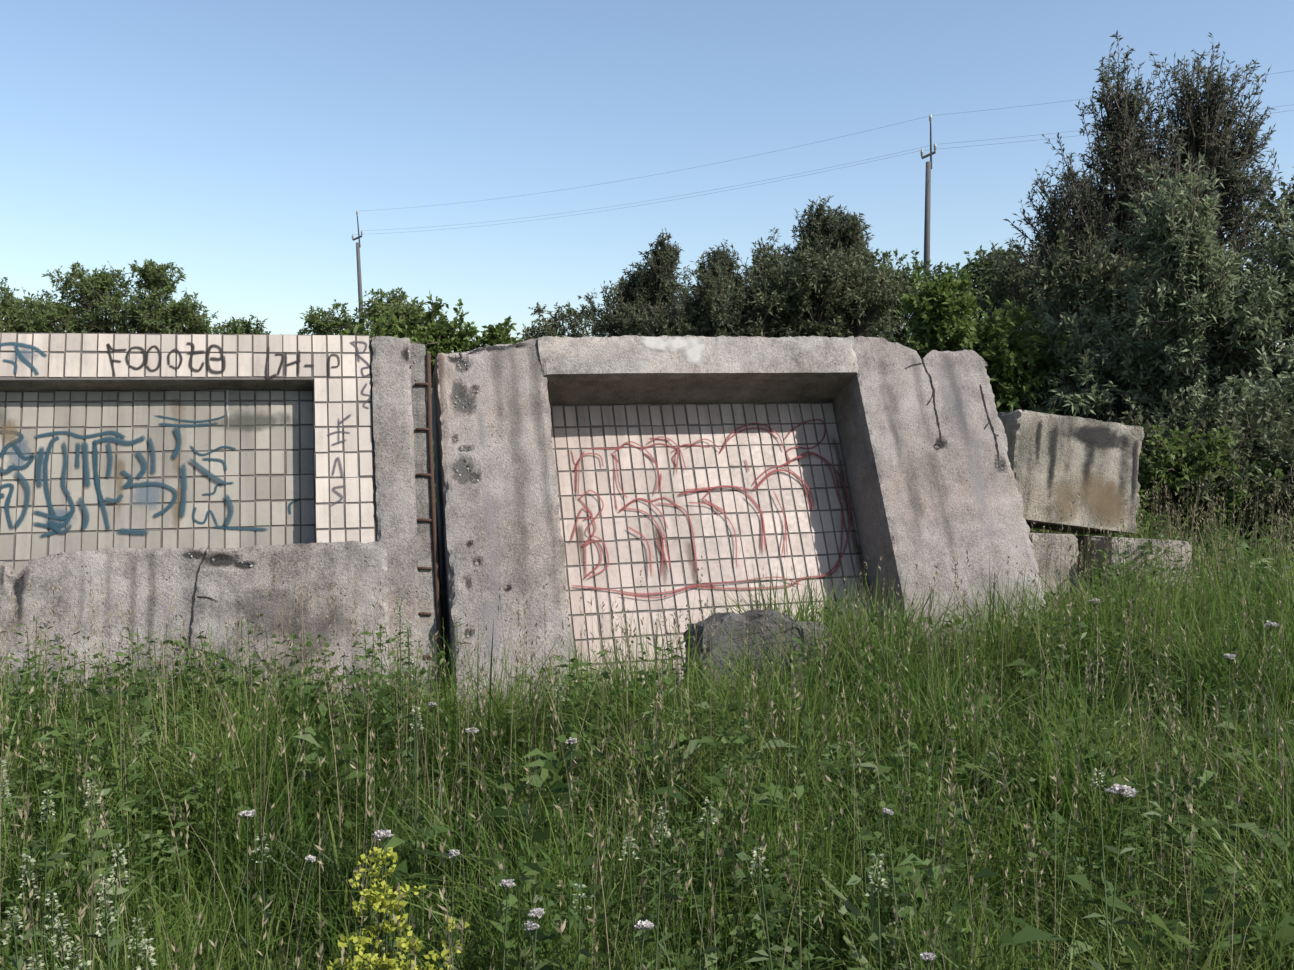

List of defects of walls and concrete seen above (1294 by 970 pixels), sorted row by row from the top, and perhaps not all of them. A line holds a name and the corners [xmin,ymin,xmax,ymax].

spalling [452,435,480,483]
crack [905,358,941,440]
crack [980,384,1000,469]
damp [1037,421,1058,488]
damp [1074,426,1139,500]
crack [172,547,237,691]